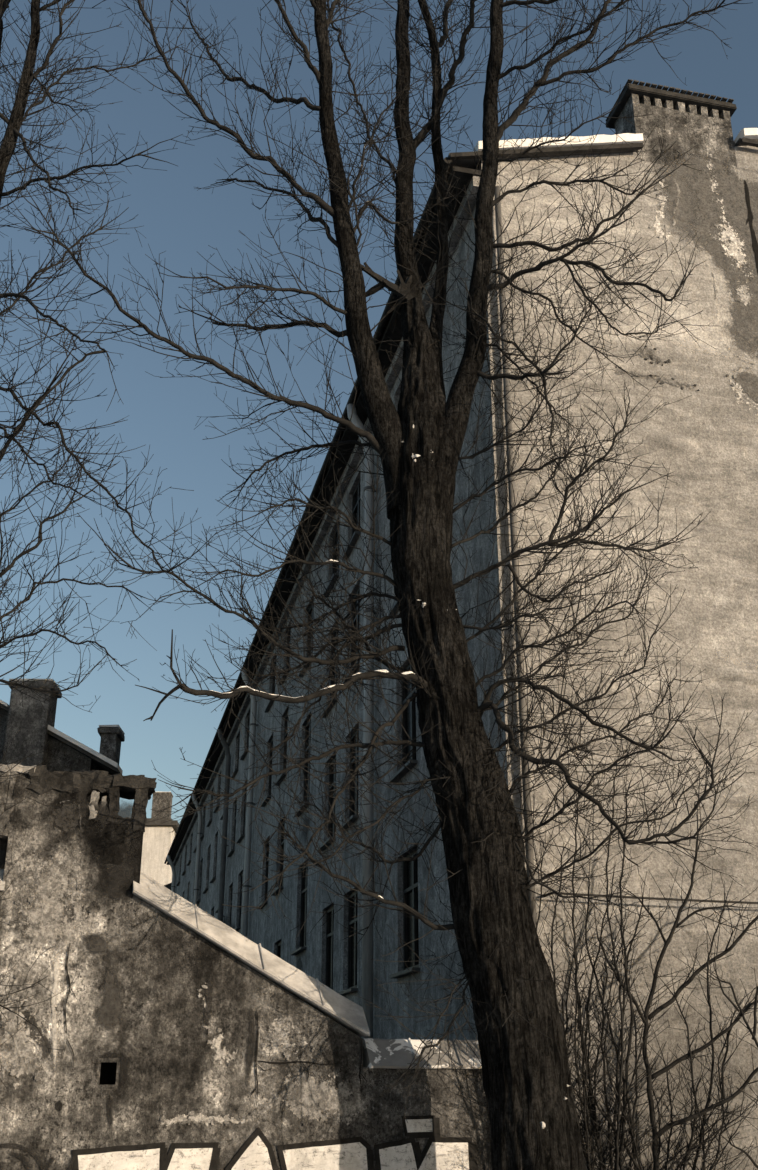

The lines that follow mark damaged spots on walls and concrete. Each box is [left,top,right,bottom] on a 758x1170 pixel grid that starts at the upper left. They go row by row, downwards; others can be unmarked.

water stain [657,153,730,241]
crack [744,180,758,271]
spalling [649,152,758,415]